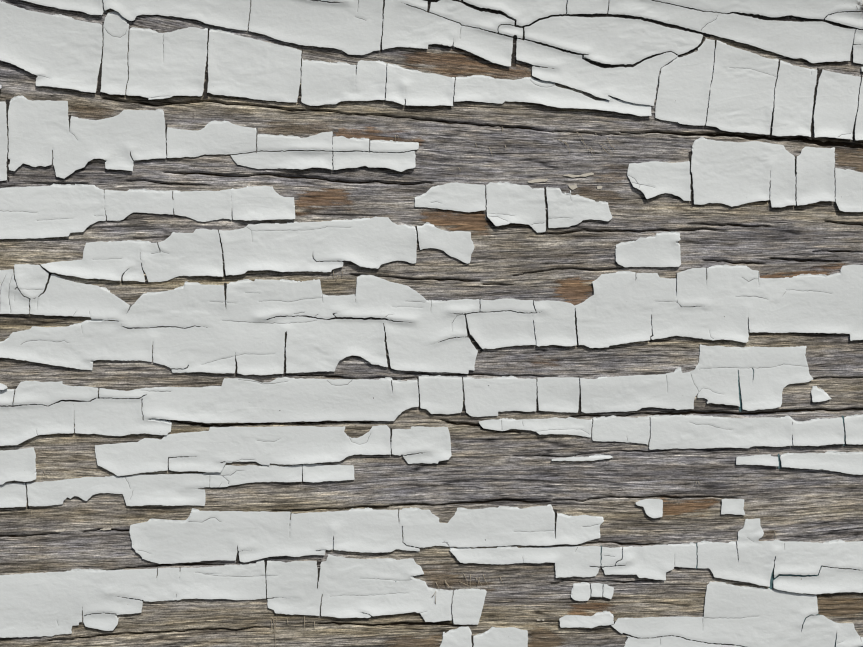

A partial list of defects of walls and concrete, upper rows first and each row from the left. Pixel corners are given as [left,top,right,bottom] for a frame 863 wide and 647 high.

crack [3,99,11,182]
peeling [0,0,863,212]
crack [96,0,863,221]
peeling [415,172,612,233]
crack [532,187,770,235]
crack [0,265,52,309]
crack [123,217,863,457]
crack [0,390,171,420]
peeling [0,183,863,647]
crack [167,420,422,489]
crack [769,565,856,589]
crack [623,633,745,647]